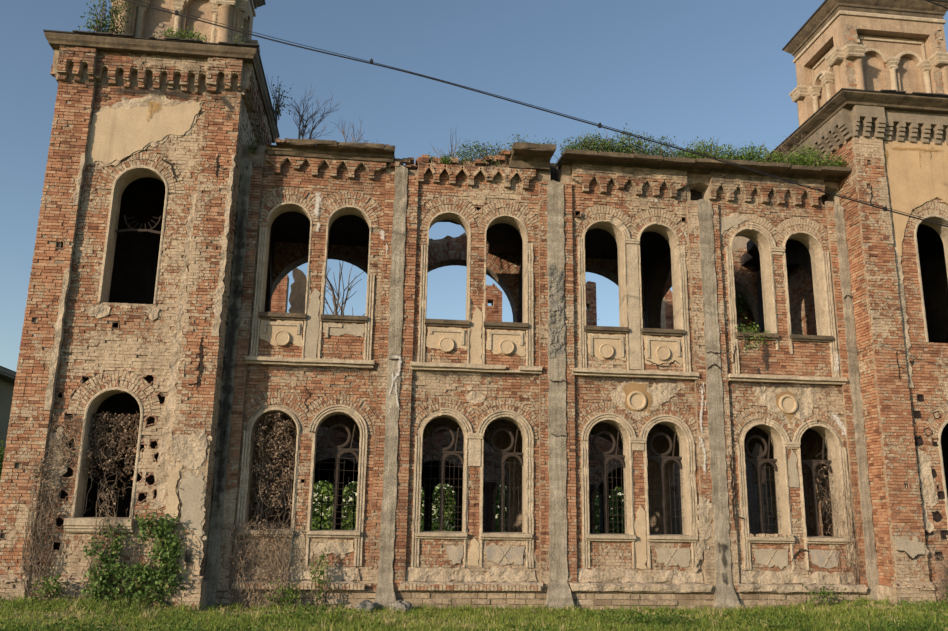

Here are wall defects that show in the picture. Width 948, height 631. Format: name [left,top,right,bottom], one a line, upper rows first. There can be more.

leakage [99,88,190,121]
flaking render [86,86,204,167]
crack [188,337,209,390]
leakage [389,356,401,407]
flaking render [42,367,168,501]
leakage [692,383,706,471]
spalling [50,514,65,529]
flaking render [131,429,213,577]
flaking render [891,449,940,565]